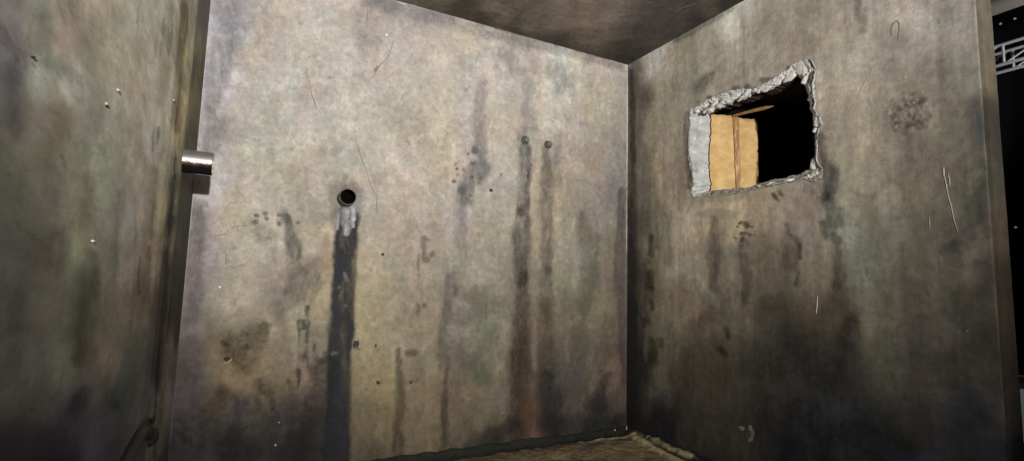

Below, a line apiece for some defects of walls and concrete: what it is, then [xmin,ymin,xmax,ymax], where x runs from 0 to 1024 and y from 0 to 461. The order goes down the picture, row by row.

spalling [687,58,824,198]
damp [814,135,835,206]
damp [323,206,359,461]